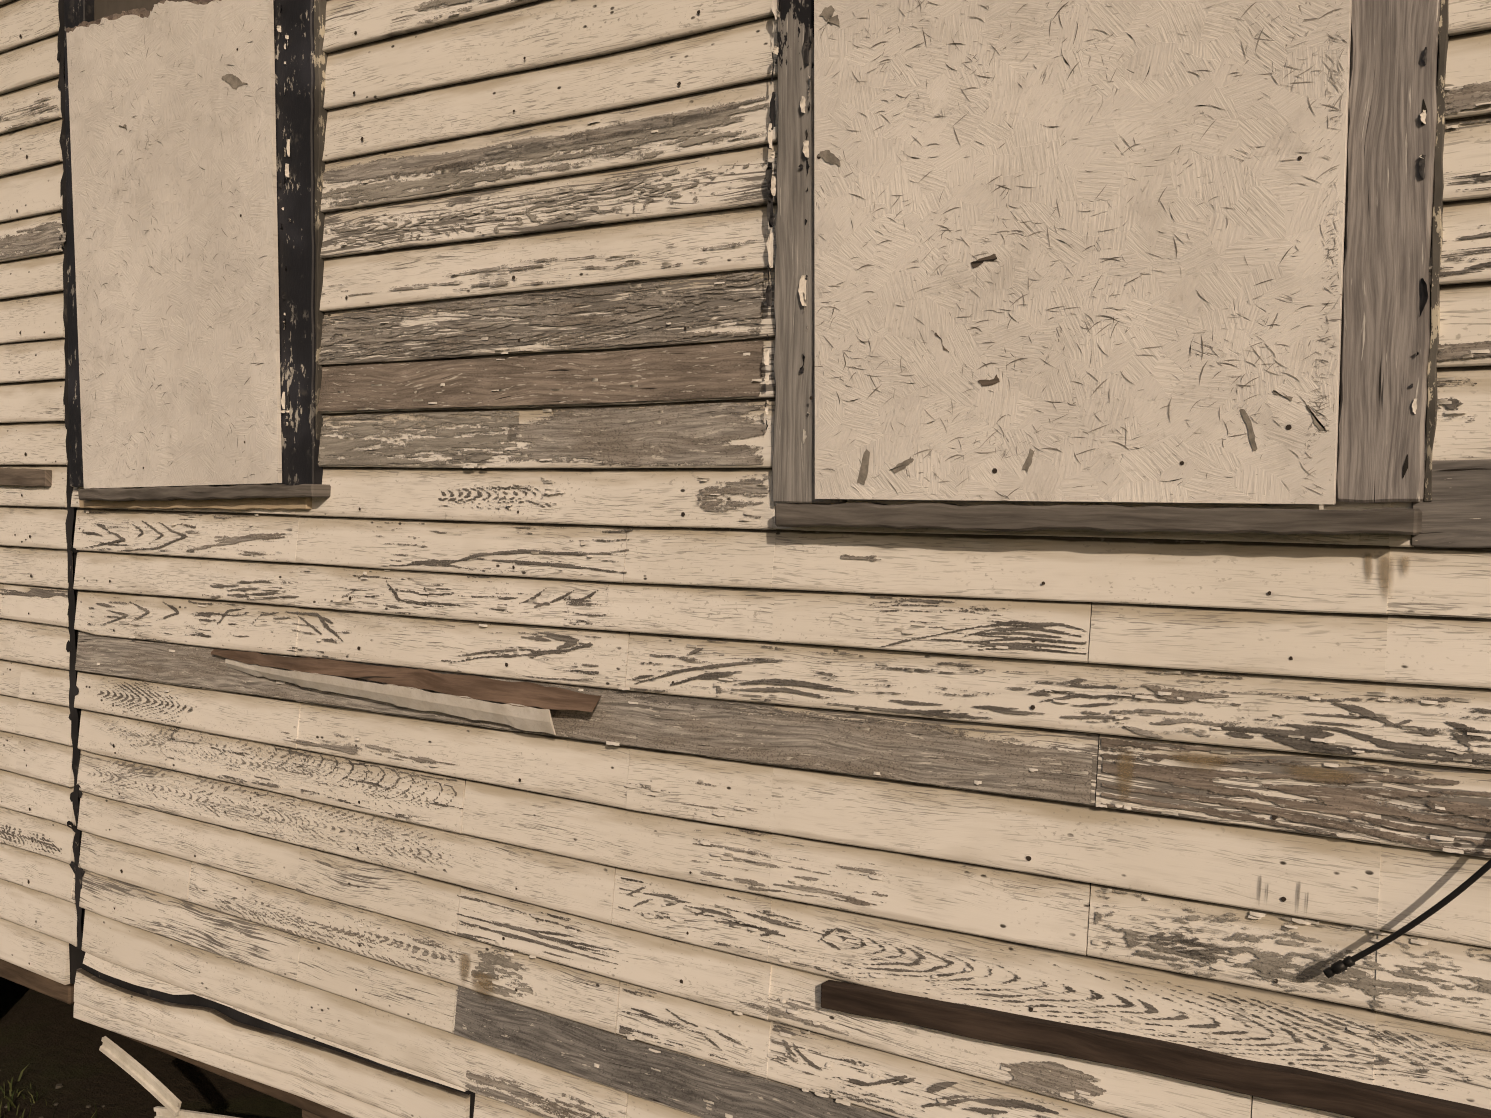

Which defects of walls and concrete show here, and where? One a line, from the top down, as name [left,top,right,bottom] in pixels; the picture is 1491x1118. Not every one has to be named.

peeling [321,0,781,306]
peeling [799,5,841,191]
peeling [798,275,808,331]
peeling [318,335,770,521]
peeling [77,510,609,691]
peeling [618,595,1491,773]
peeling [0,824,62,856]
peeling [195,887,1106,1118]
peeling [618,781,1490,1090]